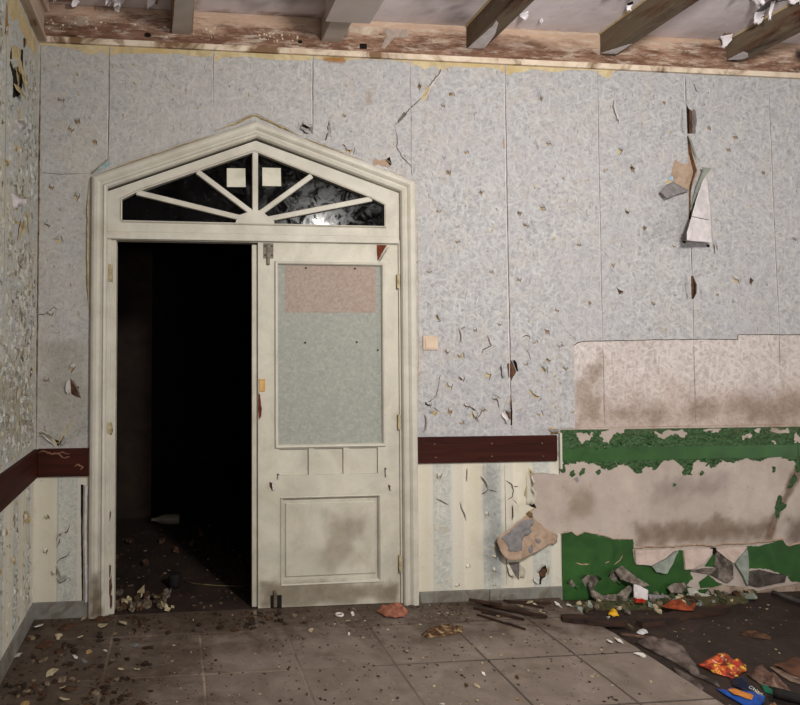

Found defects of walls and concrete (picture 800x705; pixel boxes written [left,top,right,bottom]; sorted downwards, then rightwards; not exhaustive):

peeling [105,0,126,12]
peeling [172,0,194,35]
peeling [720,33,732,49]
crack [395,65,443,173]
peeling [549,427,800,518]
peeling [554,532,800,608]